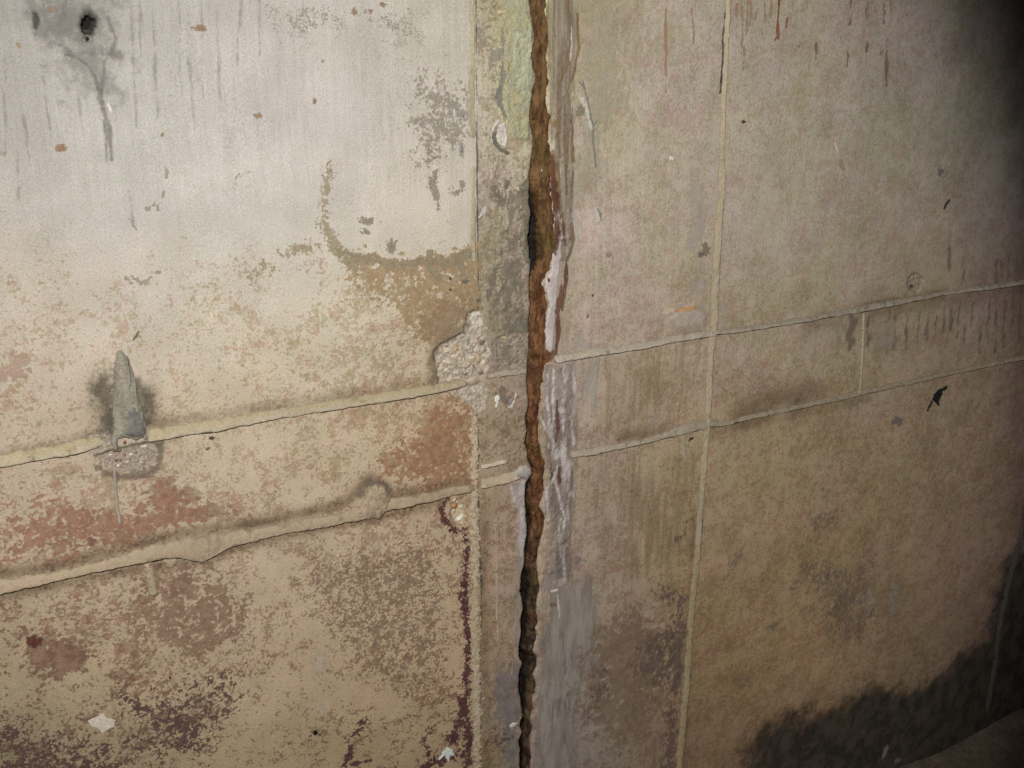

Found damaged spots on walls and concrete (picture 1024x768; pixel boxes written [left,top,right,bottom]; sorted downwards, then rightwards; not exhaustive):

water stain [93,70,112,160]
water stain [246,160,530,347]
rust [548,0,580,360]
spalling [86,430,160,475]
spalling [429,311,529,416]
crack [518,0,555,768]
water stain [533,333,692,768]
water stain [742,554,1024,768]